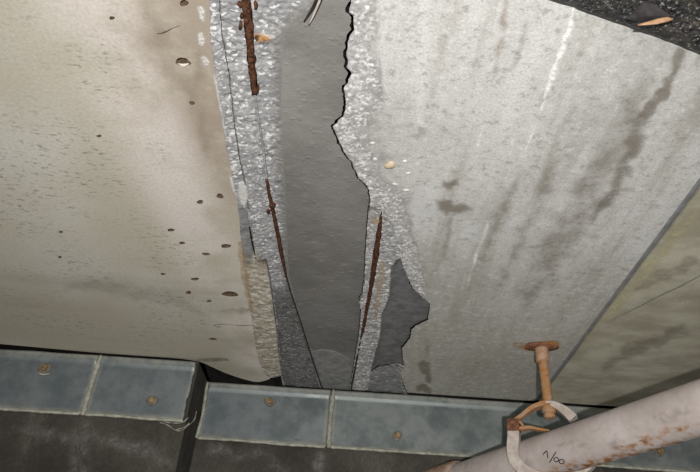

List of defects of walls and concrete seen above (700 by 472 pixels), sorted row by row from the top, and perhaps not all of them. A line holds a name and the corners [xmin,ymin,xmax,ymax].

corrosion [241,0,269,95]
leakage [540,7,575,111]
leakage [622,51,683,162]
corrosion [265,179,287,278]
spalling [198,0,429,395]
crack [331,0,370,388]
corrosion [361,211,384,333]
leakage [440,202,468,212]